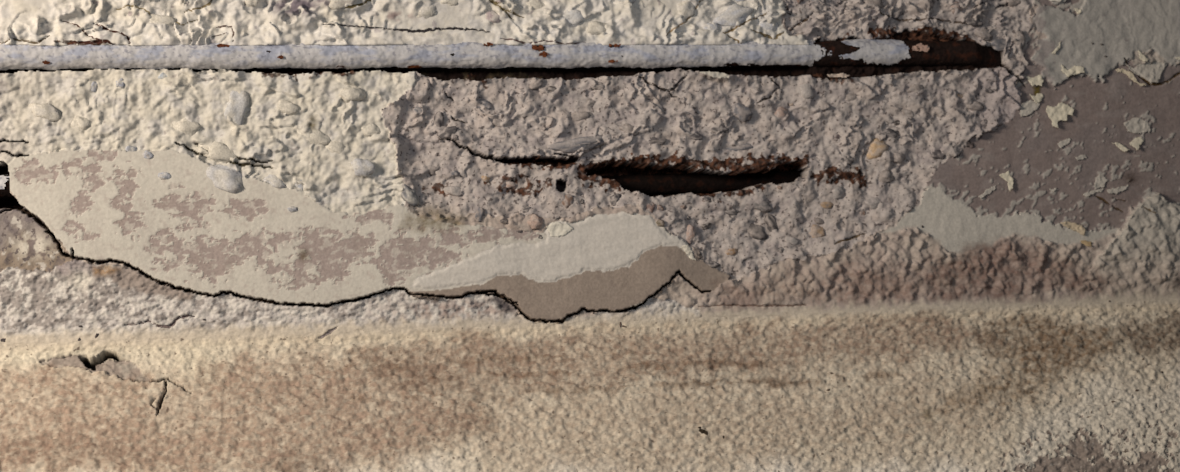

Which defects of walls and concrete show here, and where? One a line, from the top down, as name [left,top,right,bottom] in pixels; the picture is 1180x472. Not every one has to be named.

rust [867,19,982,46]
crack [0,140,29,158]
crack [175,143,274,169]
crack [445,93,501,163]
spalling [0,0,1180,281]
rust [483,150,867,203]
crack [1,208,807,338]
damp [1124,313,1180,349]
crack [132,379,193,416]
damp [0,316,1113,472]
peeling [987,403,1180,472]